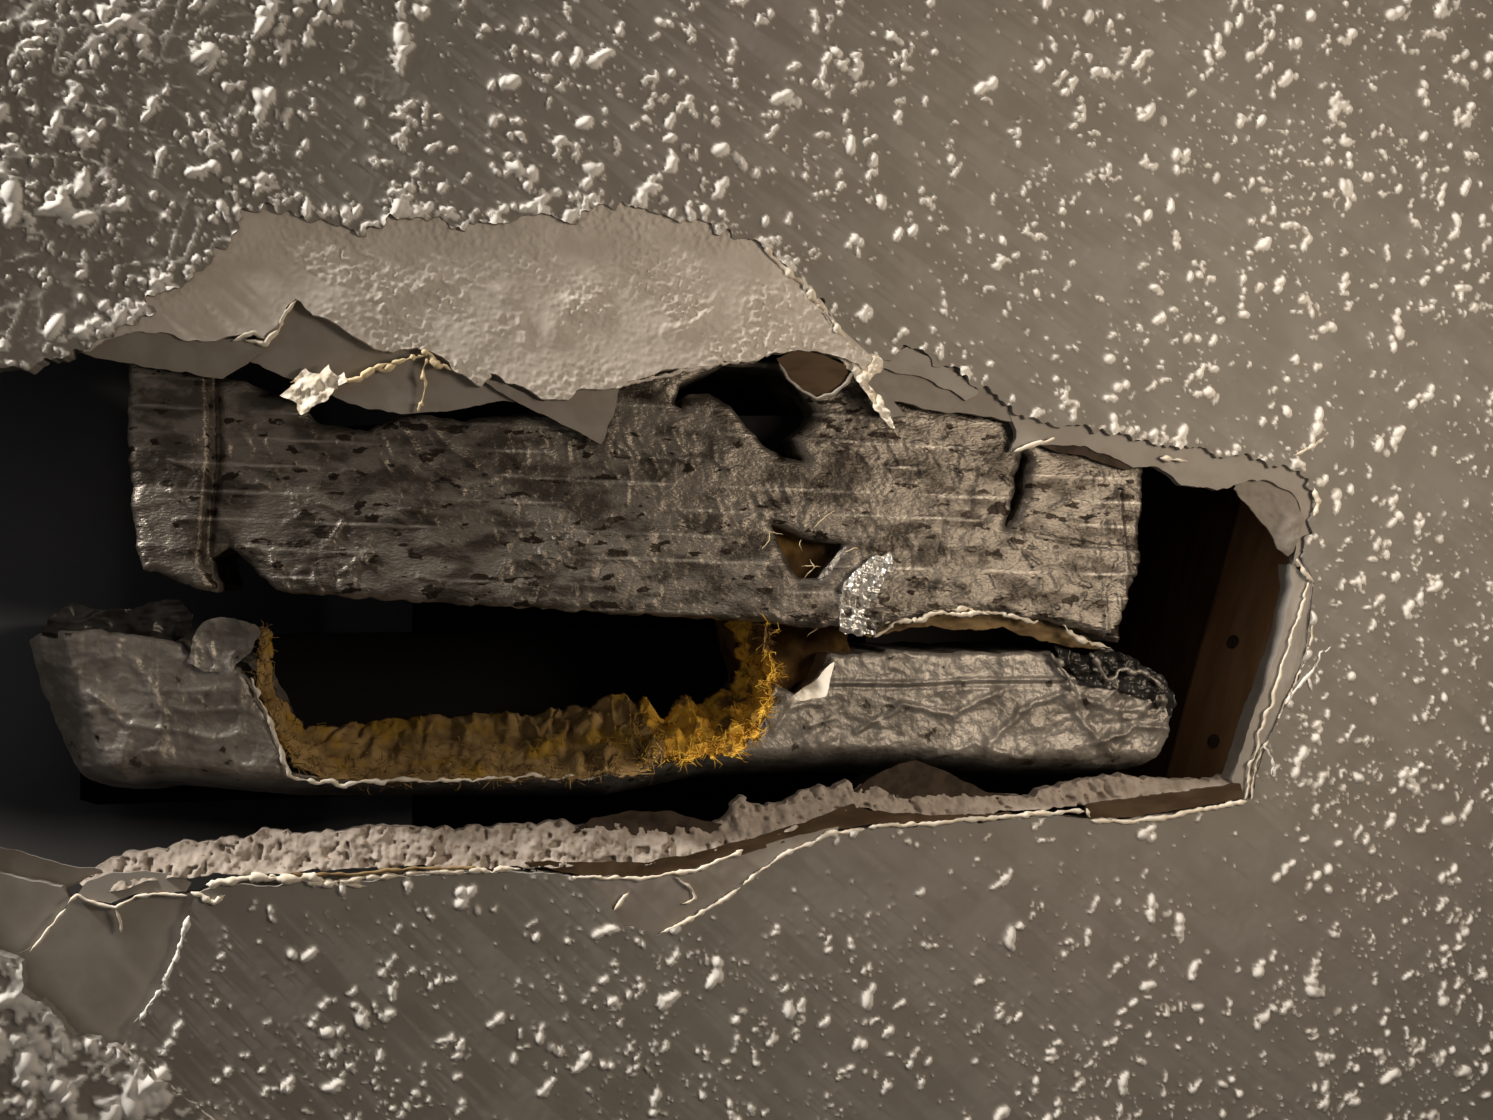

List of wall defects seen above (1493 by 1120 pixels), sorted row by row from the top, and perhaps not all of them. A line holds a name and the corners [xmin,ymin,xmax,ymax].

peeling [0,202,1331,1045]